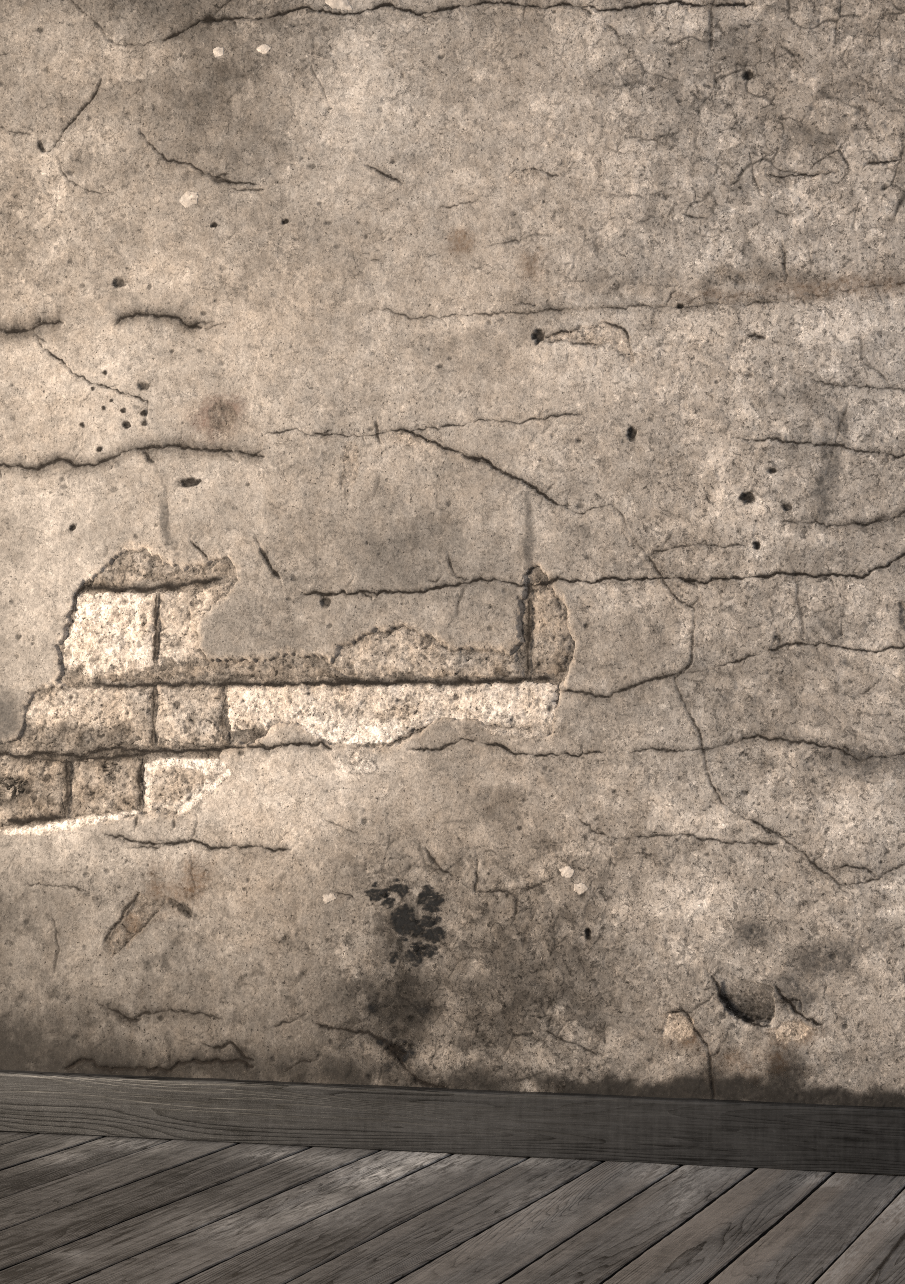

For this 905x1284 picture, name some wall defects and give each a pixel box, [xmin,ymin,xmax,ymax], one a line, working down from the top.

crack [132,0,750,46]
crack [117,311,217,328]
crack [387,293,704,352]
crack [0,318,623,517]
crack [744,369,905,463]
crack [0,720,331,763]
spalling [0,549,575,835]
crack [257,539,905,885]
crack [106,816,287,852]
damp [364,879,445,967]
damp [0,1031,133,1075]
damp [535,1054,905,1107]